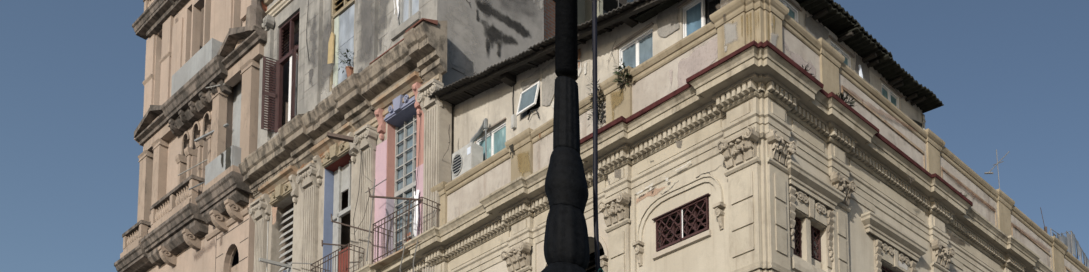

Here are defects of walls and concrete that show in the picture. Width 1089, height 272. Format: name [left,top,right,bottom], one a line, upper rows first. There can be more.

damp [476,0,534,56]